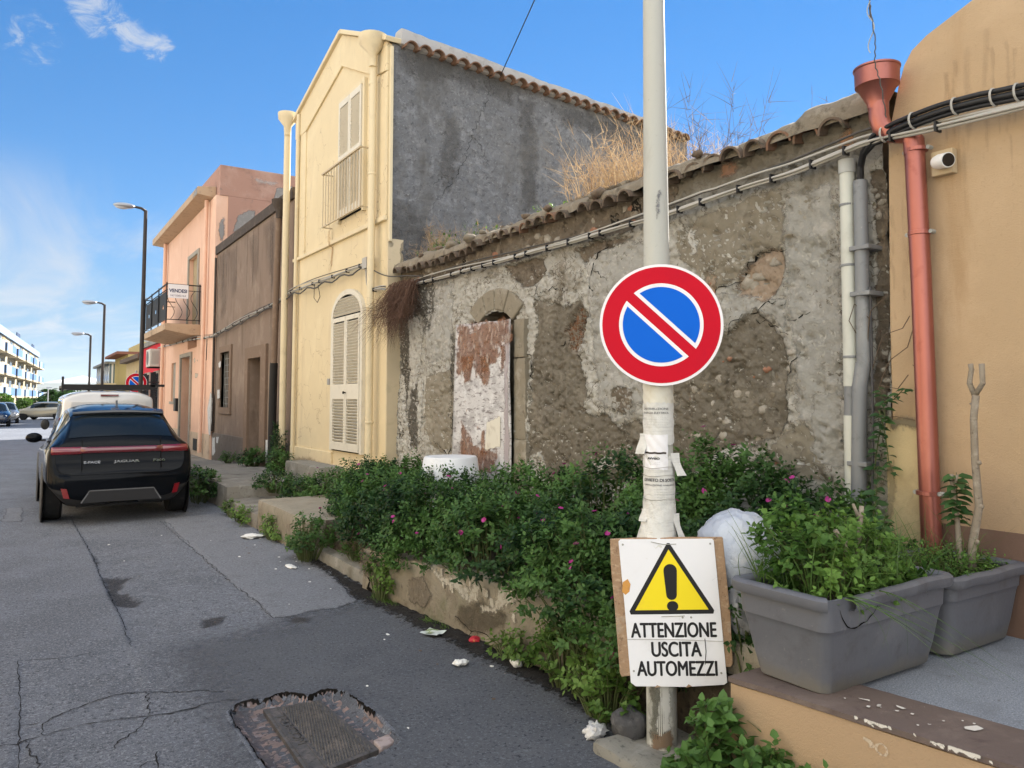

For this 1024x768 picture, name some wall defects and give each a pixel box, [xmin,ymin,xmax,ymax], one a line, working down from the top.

flaking render [668,183,680,203]
flaking render [396,177,644,485]
flaking render [673,184,844,472]
flaking render [408,567,516,623]
peeling [854,698,892,730]
peeling [930,741,993,764]